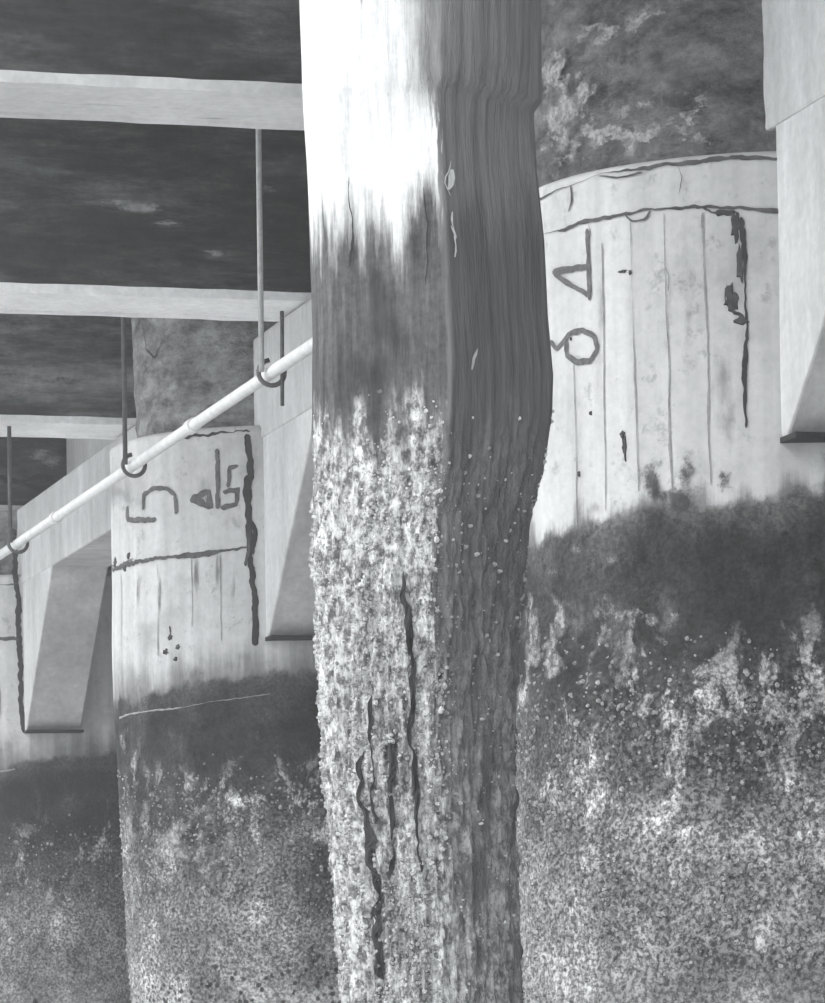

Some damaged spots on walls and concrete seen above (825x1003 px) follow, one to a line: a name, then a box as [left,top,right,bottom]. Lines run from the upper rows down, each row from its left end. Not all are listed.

crack [540,155,778,511]
crack [0,529,25,733]
crack [111,429,259,646]
crack [572,458,580,525]
water stain [645,458,693,510]